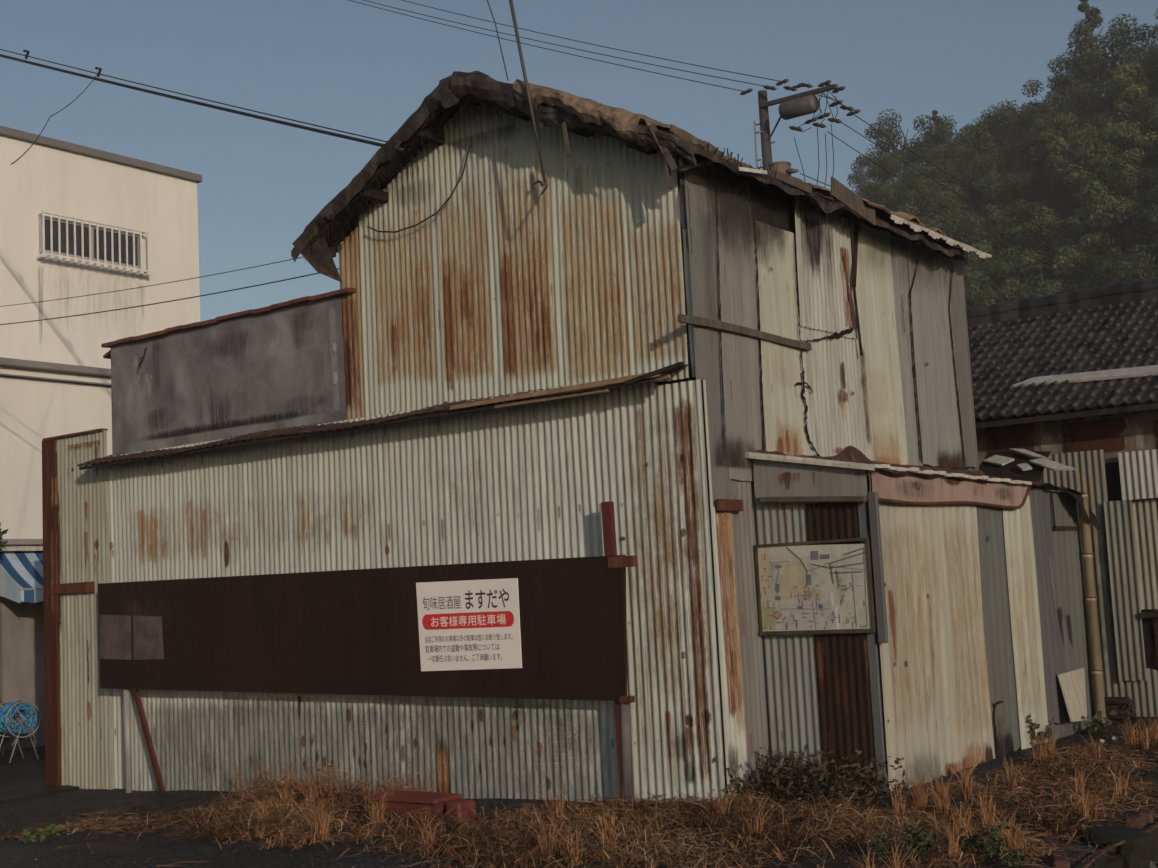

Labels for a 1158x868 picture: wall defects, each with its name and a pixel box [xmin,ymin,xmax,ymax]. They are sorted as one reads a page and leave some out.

leakage [149,399,315,440]
rust [339,226,365,420]
rust [374,183,686,389]
crack [795,236,853,457]
rust [840,248,855,330]
rust [665,401,711,778]
rust [884,575,932,695]
rust [661,712,672,770]